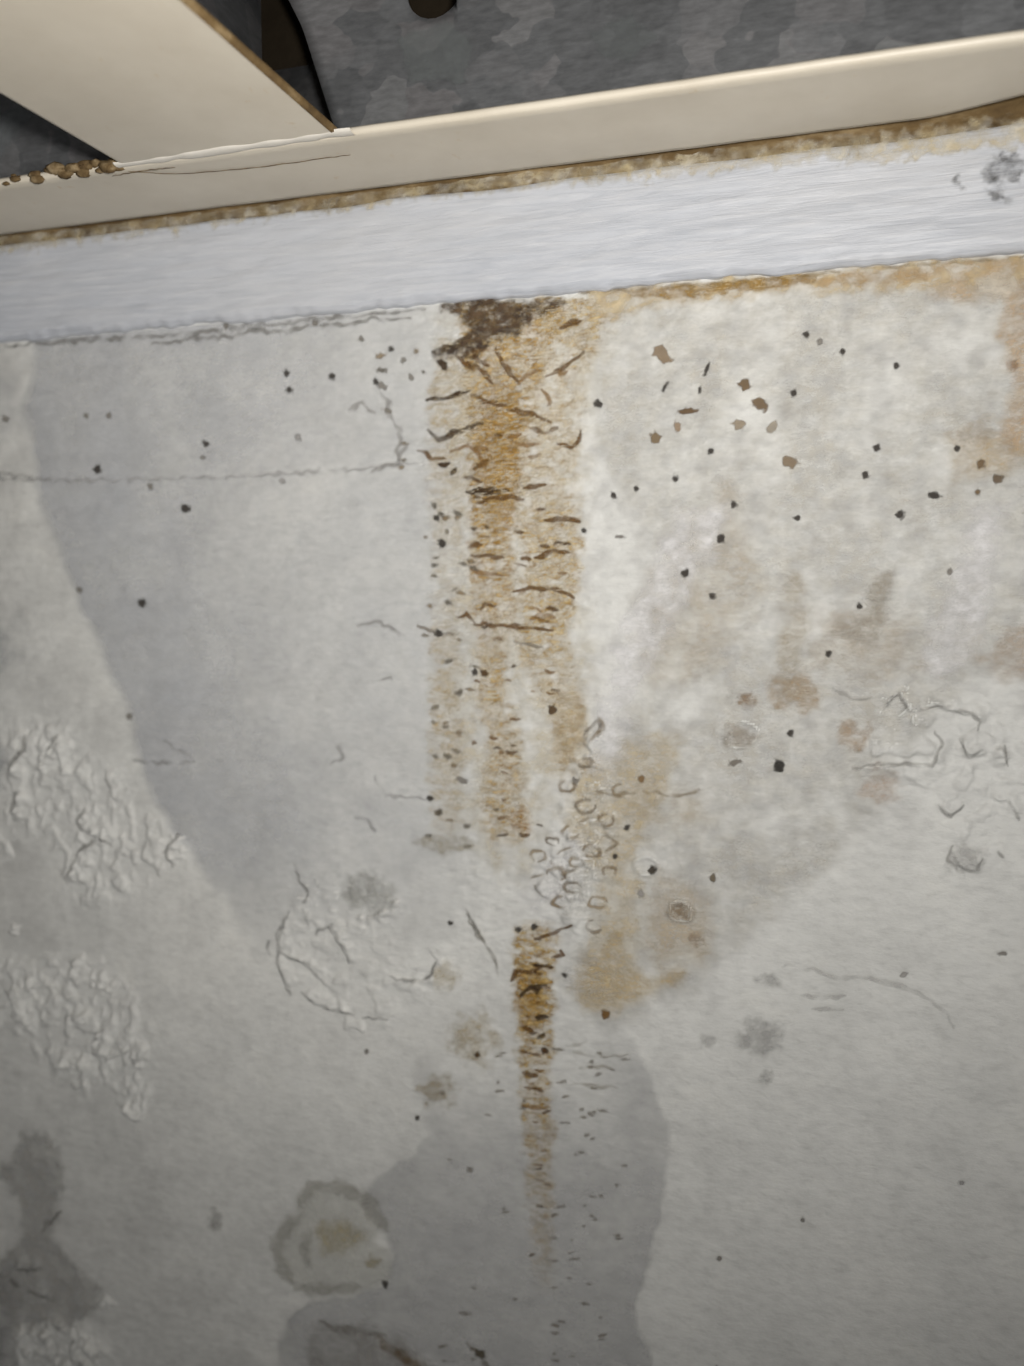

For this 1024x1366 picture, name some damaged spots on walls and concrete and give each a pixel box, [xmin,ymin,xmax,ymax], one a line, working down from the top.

water stain [31,333,147,550]
corrosion [424,256,1024,854]
corrosion [511,925,572,1185]